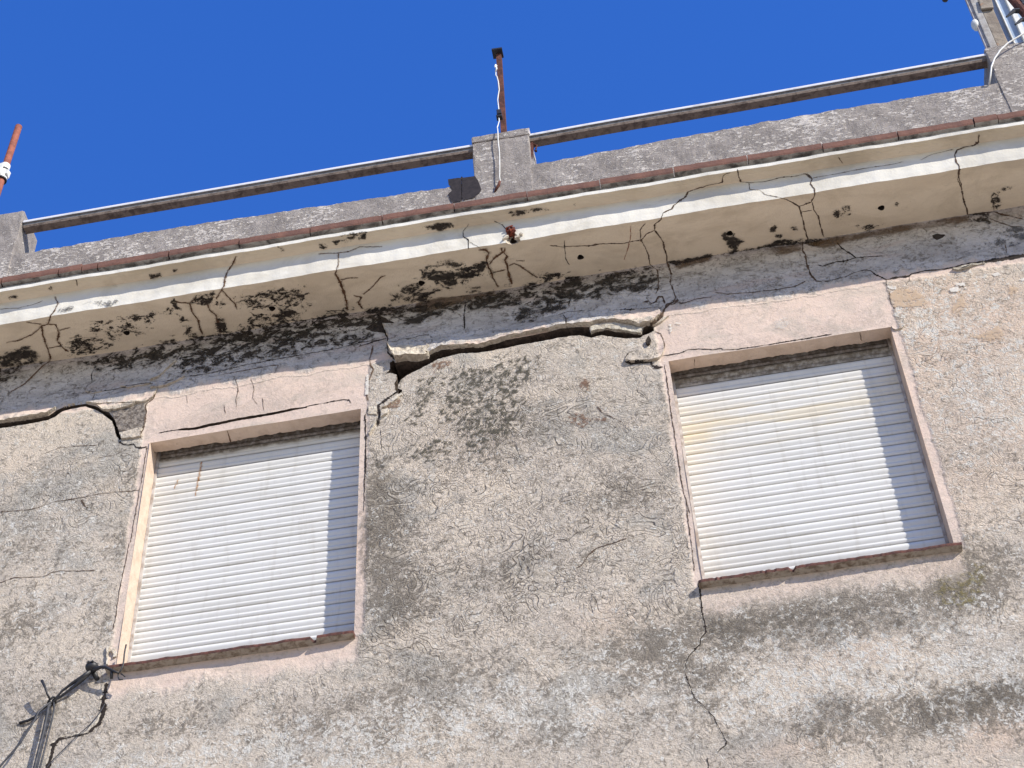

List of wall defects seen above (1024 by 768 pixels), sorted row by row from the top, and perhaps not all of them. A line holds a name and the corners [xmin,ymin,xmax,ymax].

crack [921,135,1022,227]
damp [0,346,43,385]
damp [60,206,915,377]
flaking render [590,316,677,346]
crack [0,158,1024,768]